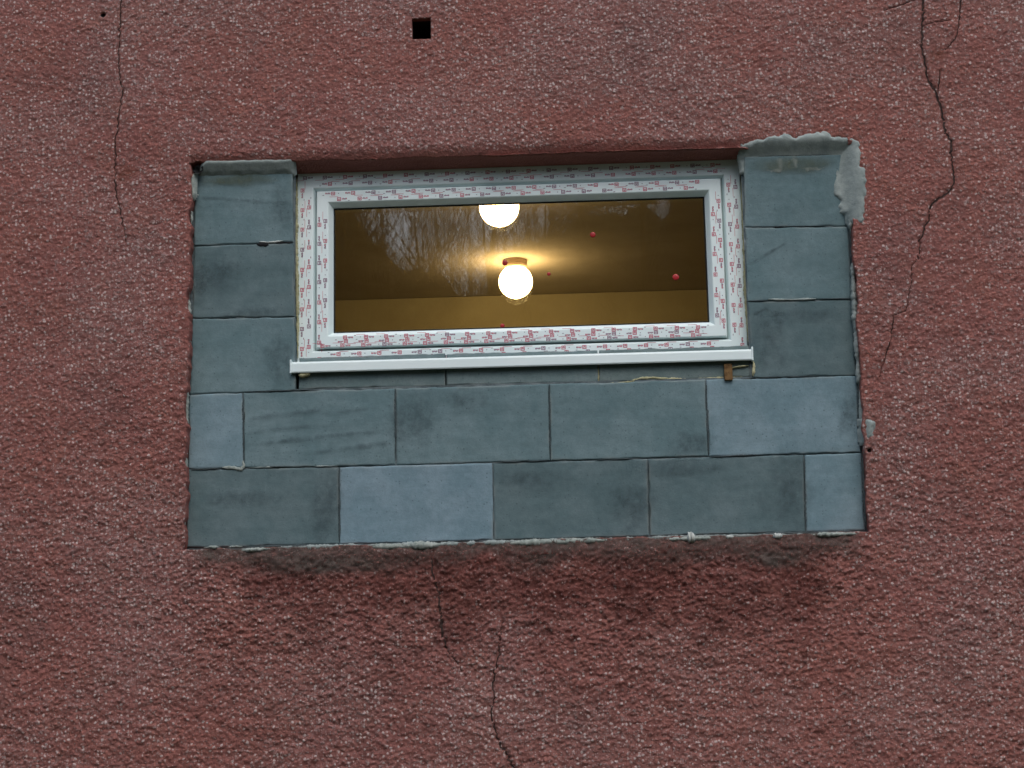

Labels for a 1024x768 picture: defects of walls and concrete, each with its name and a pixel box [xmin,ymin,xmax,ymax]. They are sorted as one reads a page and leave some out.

crack [114,0,126,241]
crack [880,0,961,373]
crack [431,552,462,671]
crack [491,621,514,767]